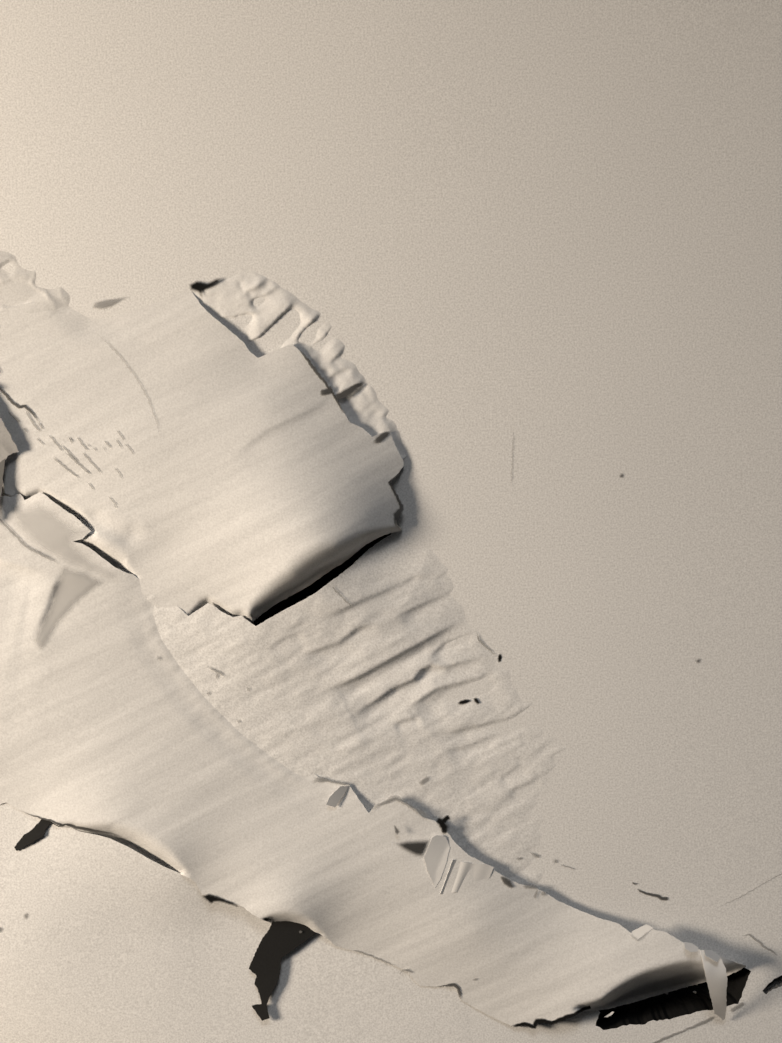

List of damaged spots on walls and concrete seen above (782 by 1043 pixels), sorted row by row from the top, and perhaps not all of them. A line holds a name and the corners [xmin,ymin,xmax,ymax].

peeling [0,267,751,1030]
spalling [763,975,782,994]